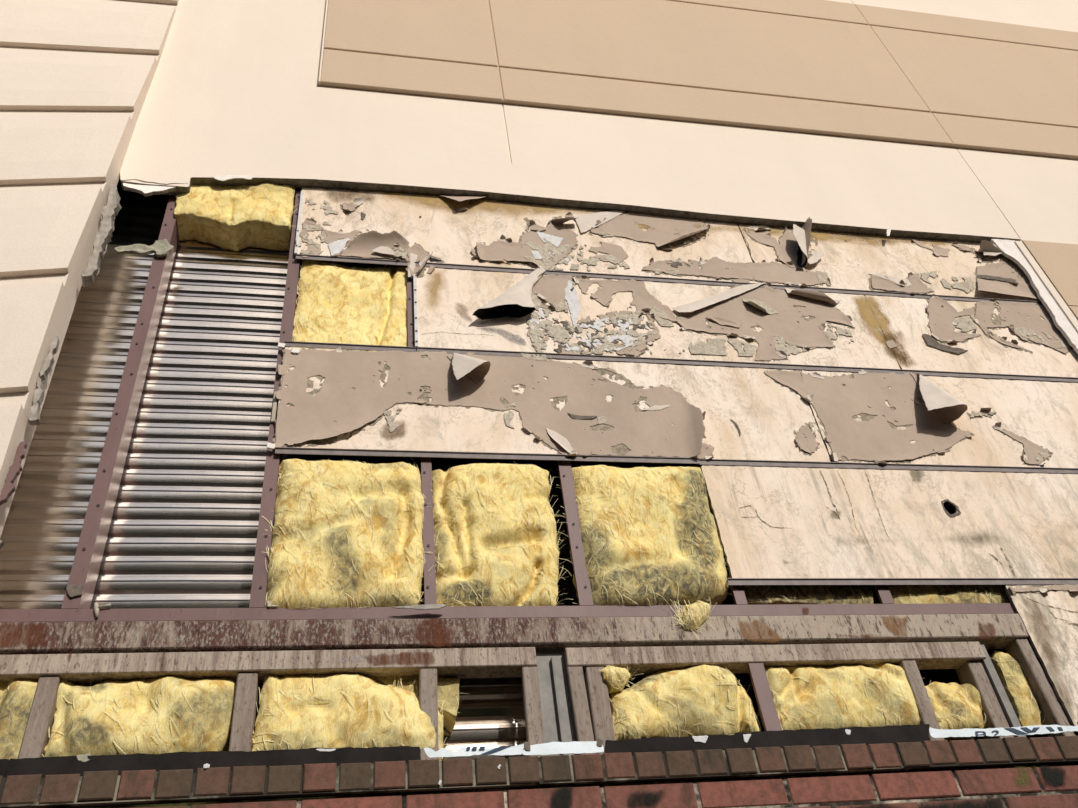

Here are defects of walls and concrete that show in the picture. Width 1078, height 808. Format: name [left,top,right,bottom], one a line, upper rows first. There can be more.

flaking render [81,178,177,287]
spalling [317,260,400,268]
leakage [856,297,912,364]
spalling [90,266,173,609]
spalling [288,454,726,606]
spalling [941,499,961,517]
spalling [721,547,745,605]
corrosion [374,619,449,665]
spalling [623,675,648,690]
spalling [733,673,765,731]
spalling [919,669,961,686]
spalling [1028,640,1078,736]